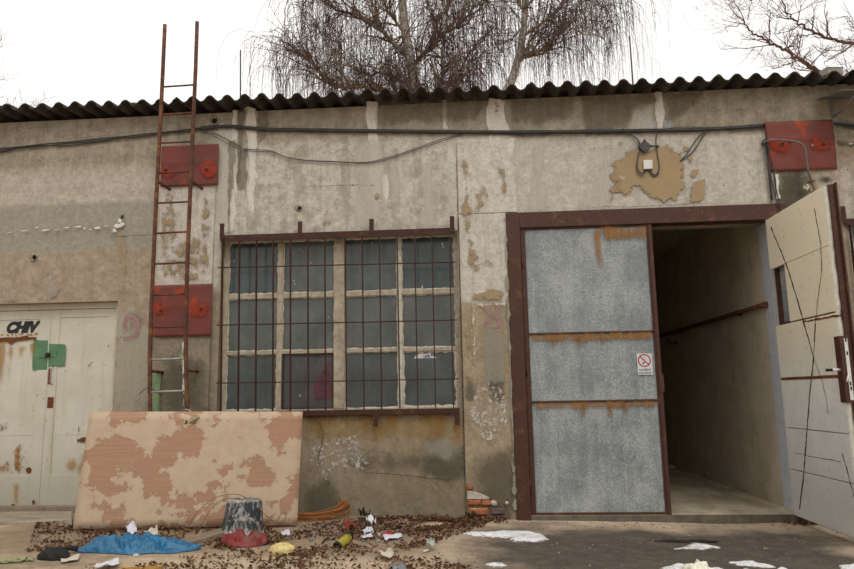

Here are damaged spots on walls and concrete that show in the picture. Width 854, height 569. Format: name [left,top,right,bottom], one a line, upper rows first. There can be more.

efflorescence [486,98,510,140]
peeling [609,142,705,203]
peeling [160,193,210,280]
peeling [461,160,492,271]
corrosion [594,225,646,262]
corrosion [0,336,36,375]
corrosion [532,331,652,344]
corrosion [536,401,655,416]